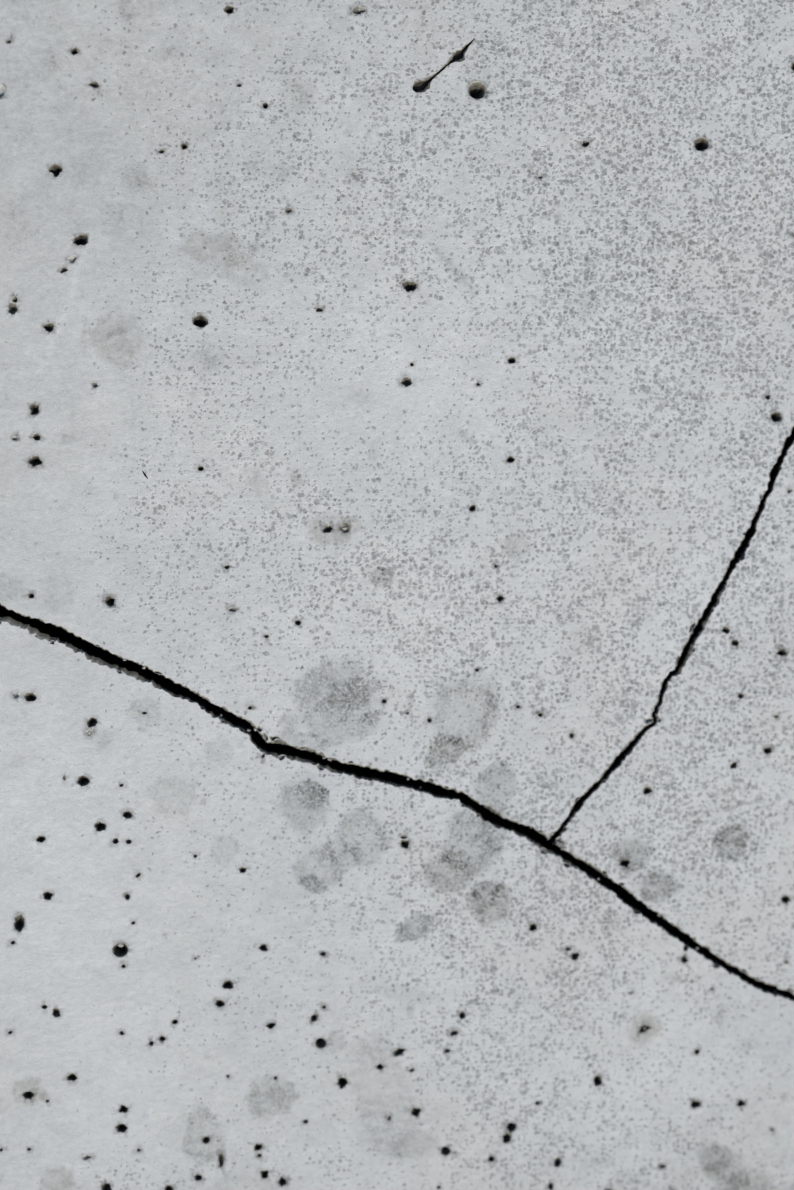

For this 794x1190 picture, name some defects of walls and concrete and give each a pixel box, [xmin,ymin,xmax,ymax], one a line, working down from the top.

crack [0,425,794,1001]